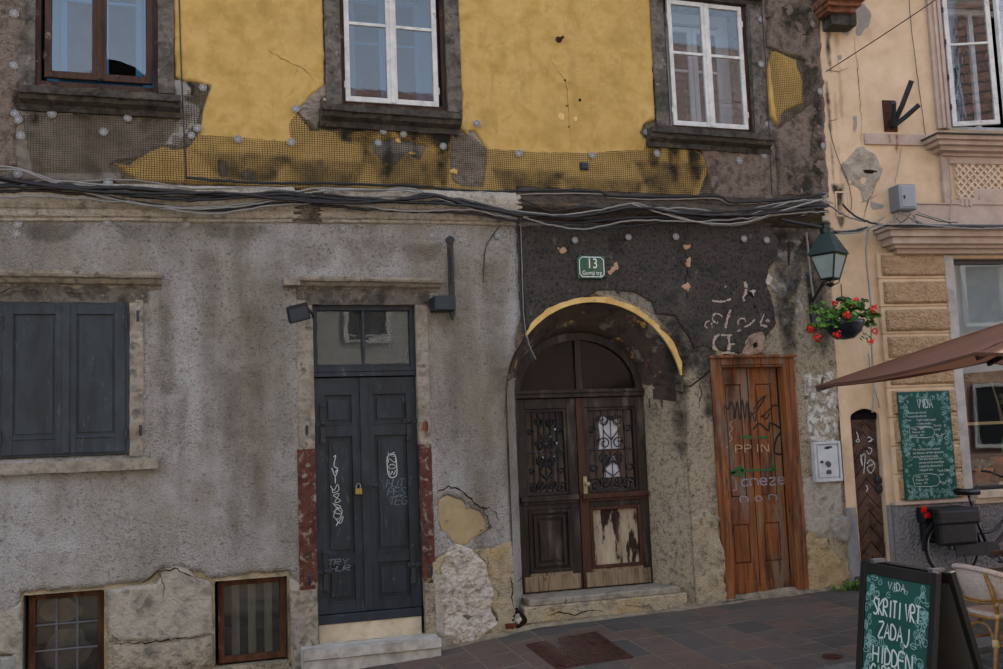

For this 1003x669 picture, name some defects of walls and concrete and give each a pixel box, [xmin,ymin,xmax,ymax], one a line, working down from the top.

spalling [164,80,199,145]
spalling [297,84,326,131]
spalling [449,130,486,187]
spalling [840,146,884,210]
spalling [438,495,498,645]
spalling [512,608,527,628]